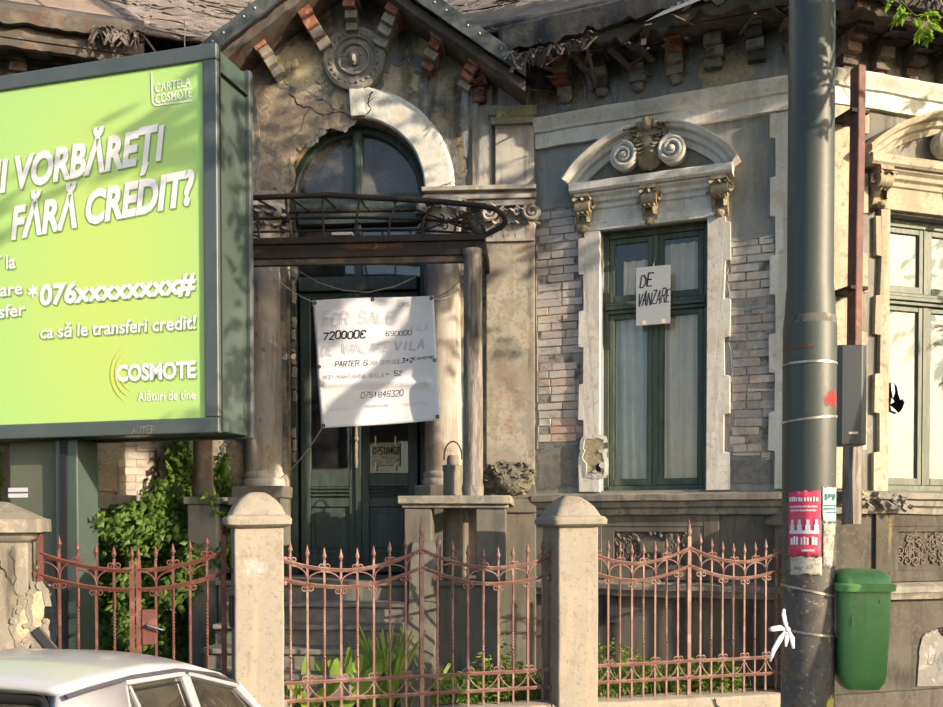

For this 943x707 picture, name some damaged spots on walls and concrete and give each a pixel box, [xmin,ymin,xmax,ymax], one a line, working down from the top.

spalling [694,46,761,90]
crack [289,91,378,139]
flaking render [535,202,609,479]
flaking render [724,234,776,462]
crack [0,542,25,604]
spalling [9,581,52,649]